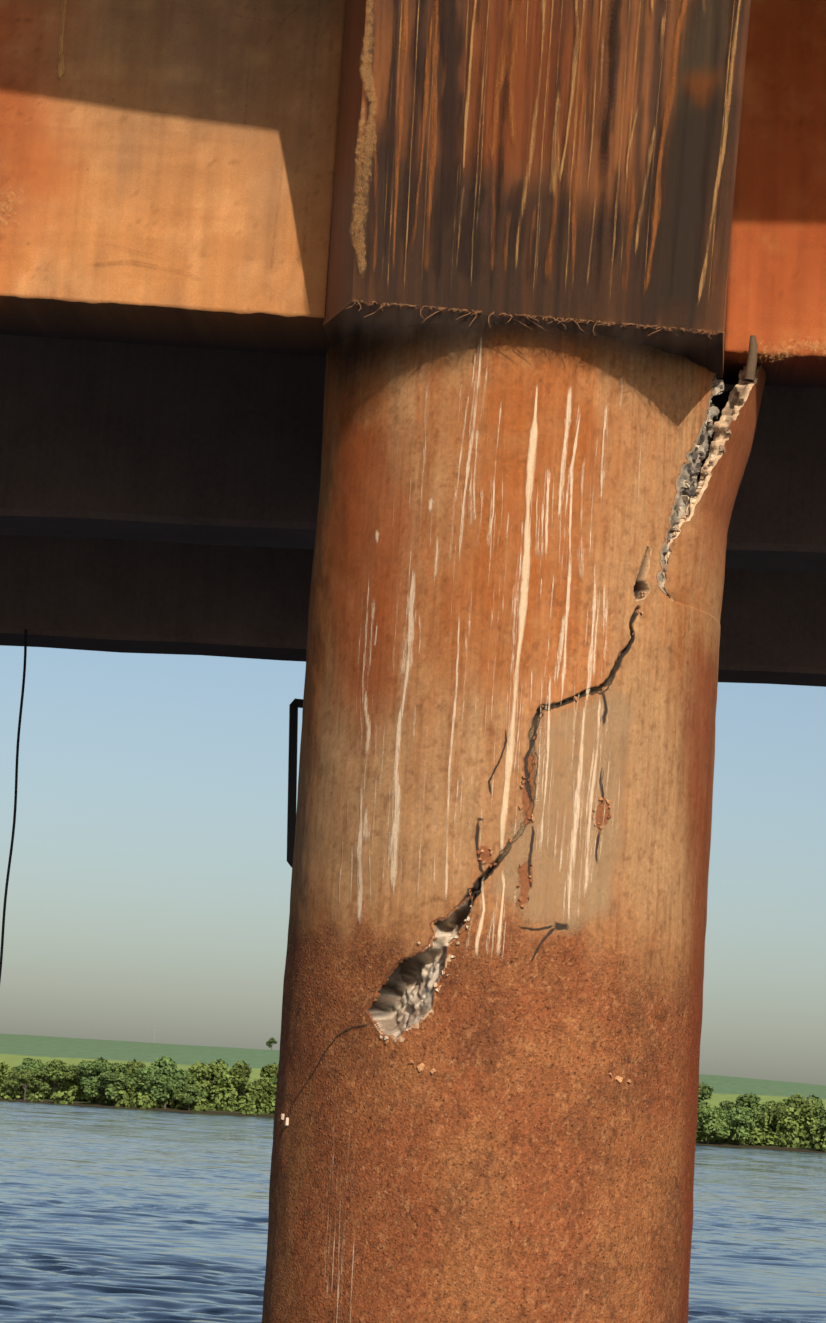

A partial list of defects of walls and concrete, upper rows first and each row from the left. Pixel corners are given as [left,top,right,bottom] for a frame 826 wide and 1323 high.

leakage [339,0,741,552]
crack [657,373,720,594]
spalling [632,366,761,614]
efflorescence [340,553,420,919]
efflorescence [447,624,472,820]
crack [461,610,638,907]
efflorescence [475,388,625,953]
crack [281,1024,369,1127]
spalling [363,896,476,1045]
crack [521,922,568,961]
rust [684,663,715,1322]